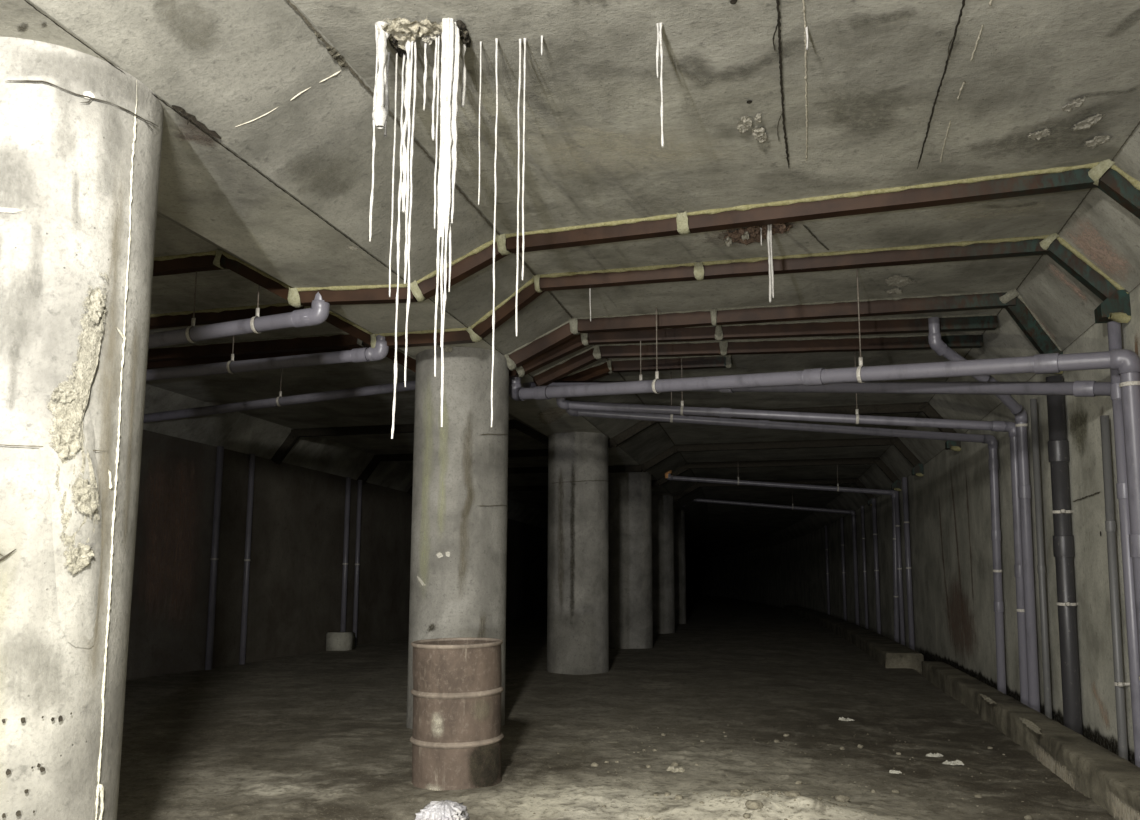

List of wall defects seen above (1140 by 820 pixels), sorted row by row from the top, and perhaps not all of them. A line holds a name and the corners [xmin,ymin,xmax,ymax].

crack [772,0,789,168]
crack [917,0,965,169]
crack [8,0,572,354]
leakage [94,80,138,820]
leakage [919,650,1021,702]
leakage [1040,705,1064,725]
leakage [1082,723,1135,765]